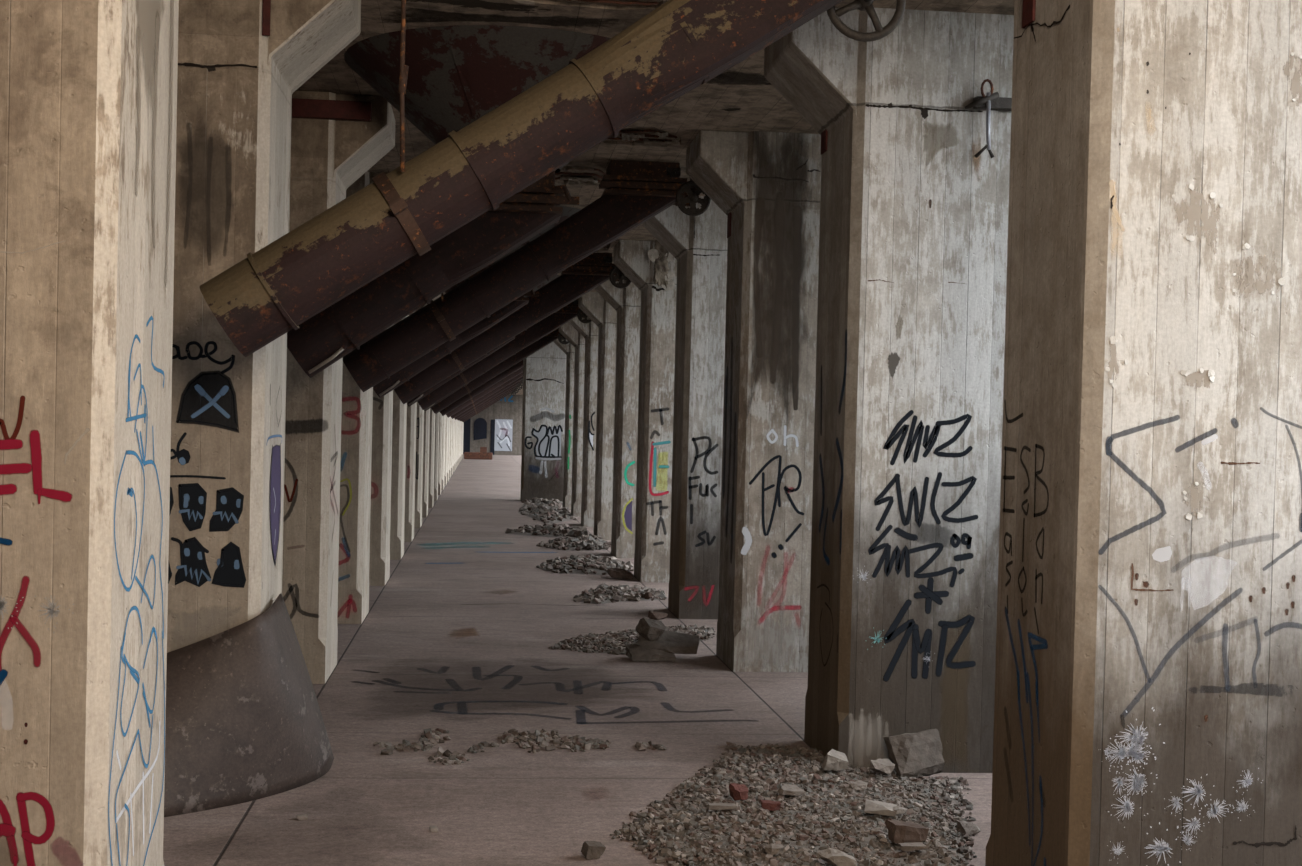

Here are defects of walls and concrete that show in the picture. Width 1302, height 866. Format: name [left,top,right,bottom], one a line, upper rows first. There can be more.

crack [178,61,257,69]
water stain [749,131,807,418]